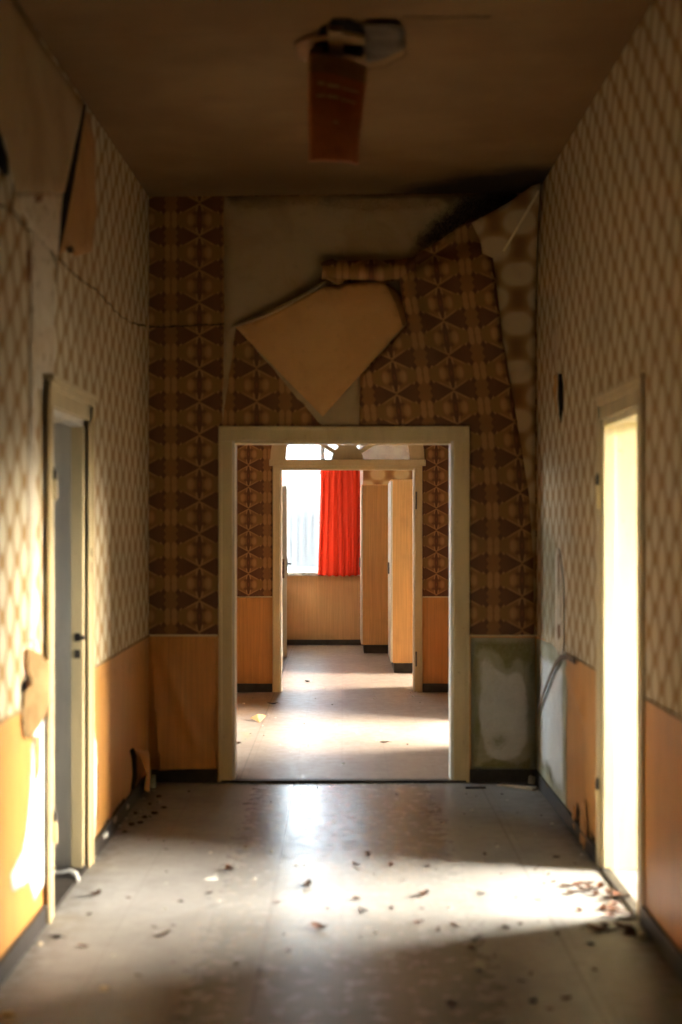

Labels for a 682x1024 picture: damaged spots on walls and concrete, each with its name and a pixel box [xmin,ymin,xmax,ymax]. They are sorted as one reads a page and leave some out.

flaking render [26,111,96,643]
flaking render [222,194,520,426]
flaking render [11,719,44,901]
water stain [472,640,553,784]